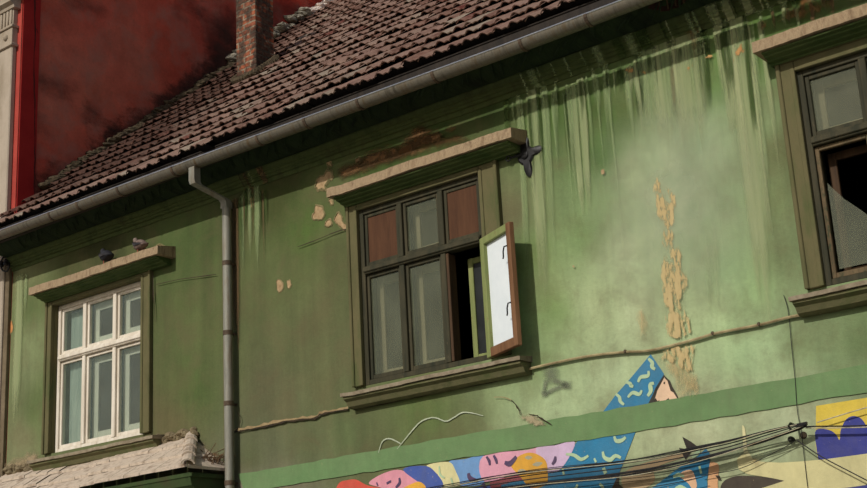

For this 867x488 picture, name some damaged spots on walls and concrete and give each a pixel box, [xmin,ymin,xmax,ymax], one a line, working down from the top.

flaking render [276,279,292,293]
flaking render [312,161,346,231]
water stain [503,0,833,262]
peeling [653,178,695,386]